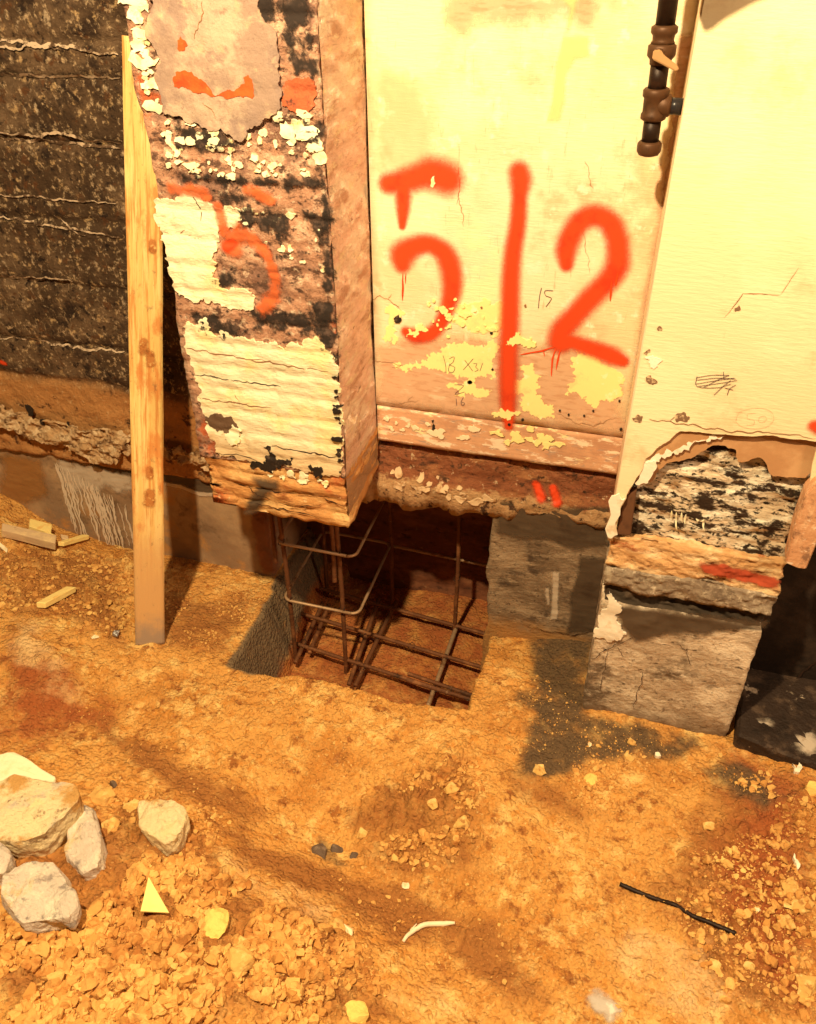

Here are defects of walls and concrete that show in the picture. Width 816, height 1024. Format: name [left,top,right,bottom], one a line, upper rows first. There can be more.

flaking render [118,0,328,181]
peeling [264,241,306,264]
spalling [0,404,131,465]
peeling [163,317,346,488]
peeling [379,298,643,450]
leakage [54,461,133,548]
spalling [617,445,811,557]
spalling [593,591,627,642]